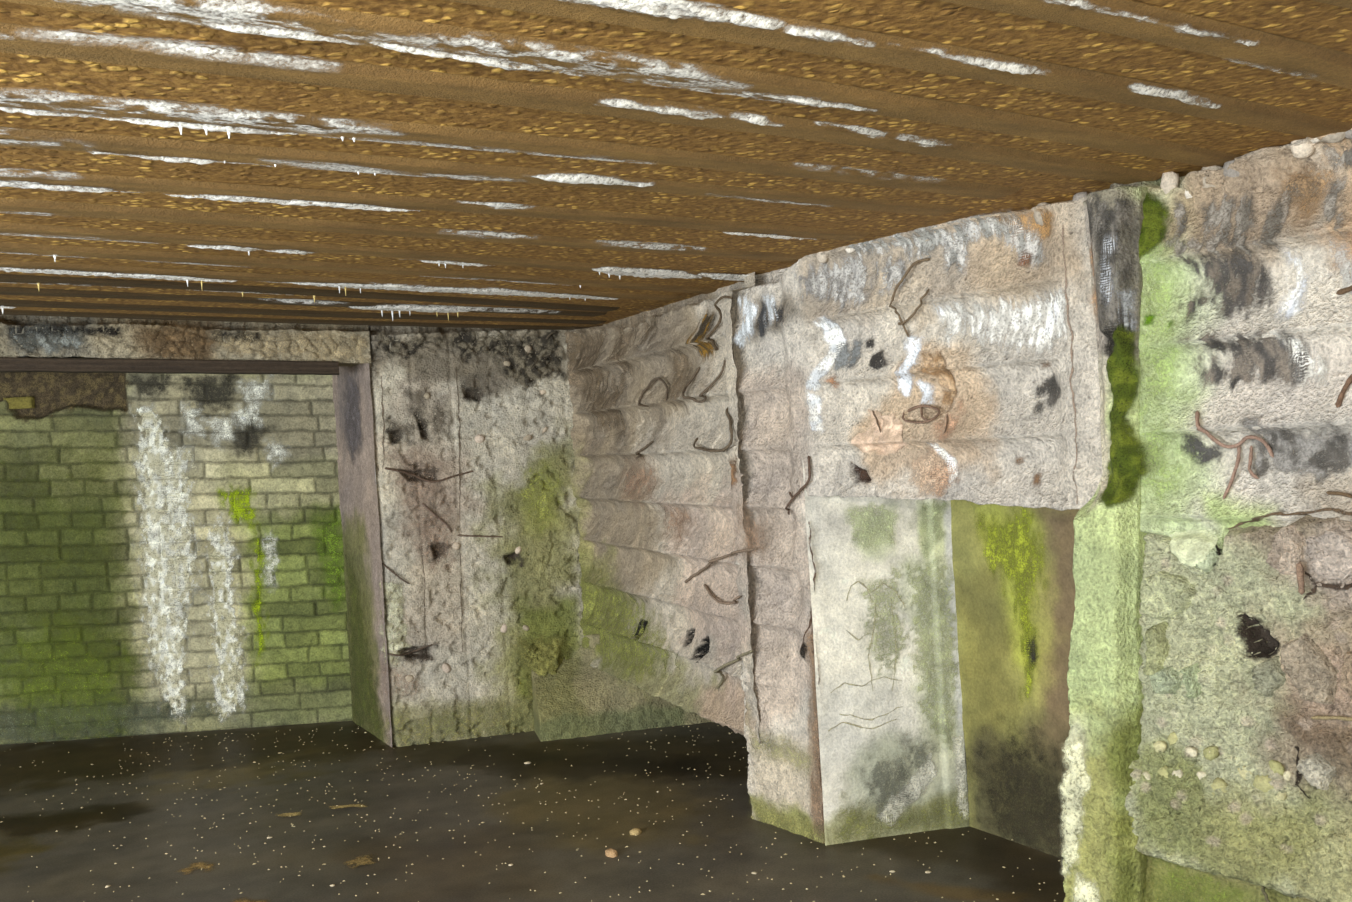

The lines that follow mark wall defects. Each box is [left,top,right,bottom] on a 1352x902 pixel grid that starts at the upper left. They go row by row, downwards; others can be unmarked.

damp [40,0,943,147]
damp [928,49,1042,75]
damp [0,94,507,152]
damp [0,168,138,193]
damp [85,145,245,165]
damp [166,194,419,212]
damp [532,153,653,187]
damp [592,267,784,347]
rust [685,313,715,358]
damp [1166,186,1328,389]
damp [130,374,286,722]
spalling [1125,515,1352,902]